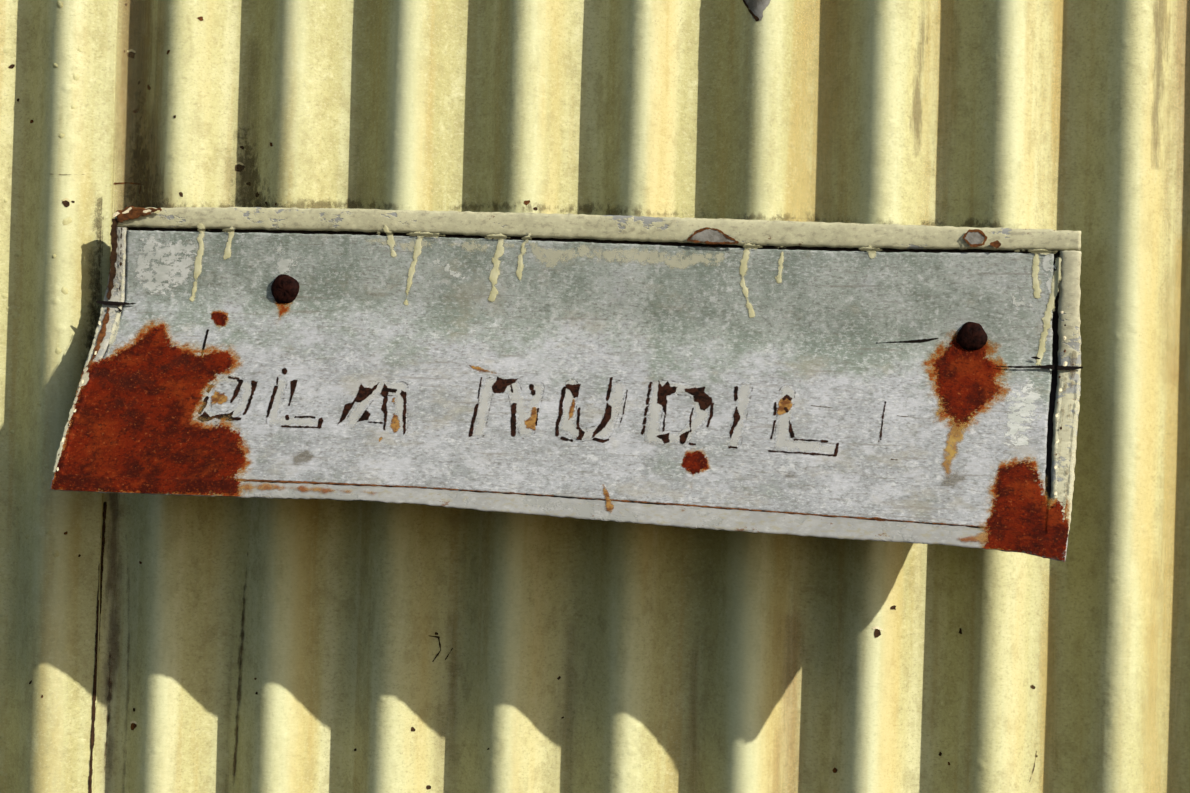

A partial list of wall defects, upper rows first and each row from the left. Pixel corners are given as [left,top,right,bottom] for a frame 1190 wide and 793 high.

peeling [743,0,771,22]
corrosion [924,332,1010,474]
corrosion [51,321,332,793]
corrosion [681,450,710,474]
corrosion [961,457,1069,562]